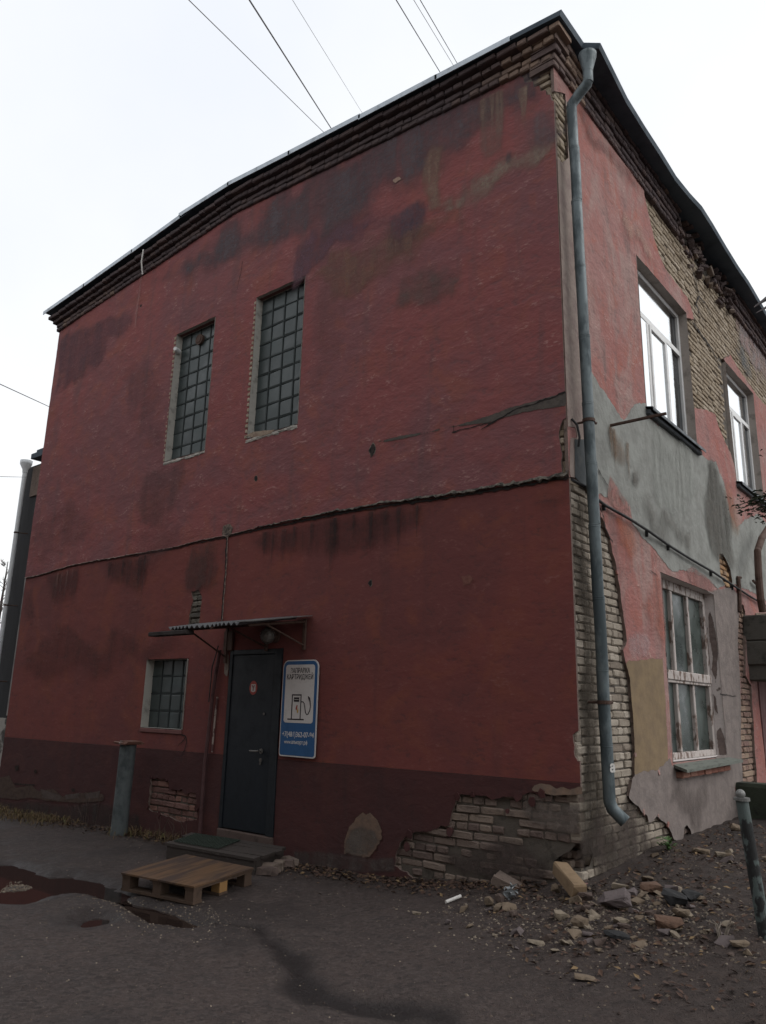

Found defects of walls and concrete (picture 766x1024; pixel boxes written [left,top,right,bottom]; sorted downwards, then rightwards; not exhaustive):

water stain [186,75,552,282]
crack [25,471,569,621]
crack [451,391,565,433]
peeling [368,70,766,882]
spalling [145,776,199,822]